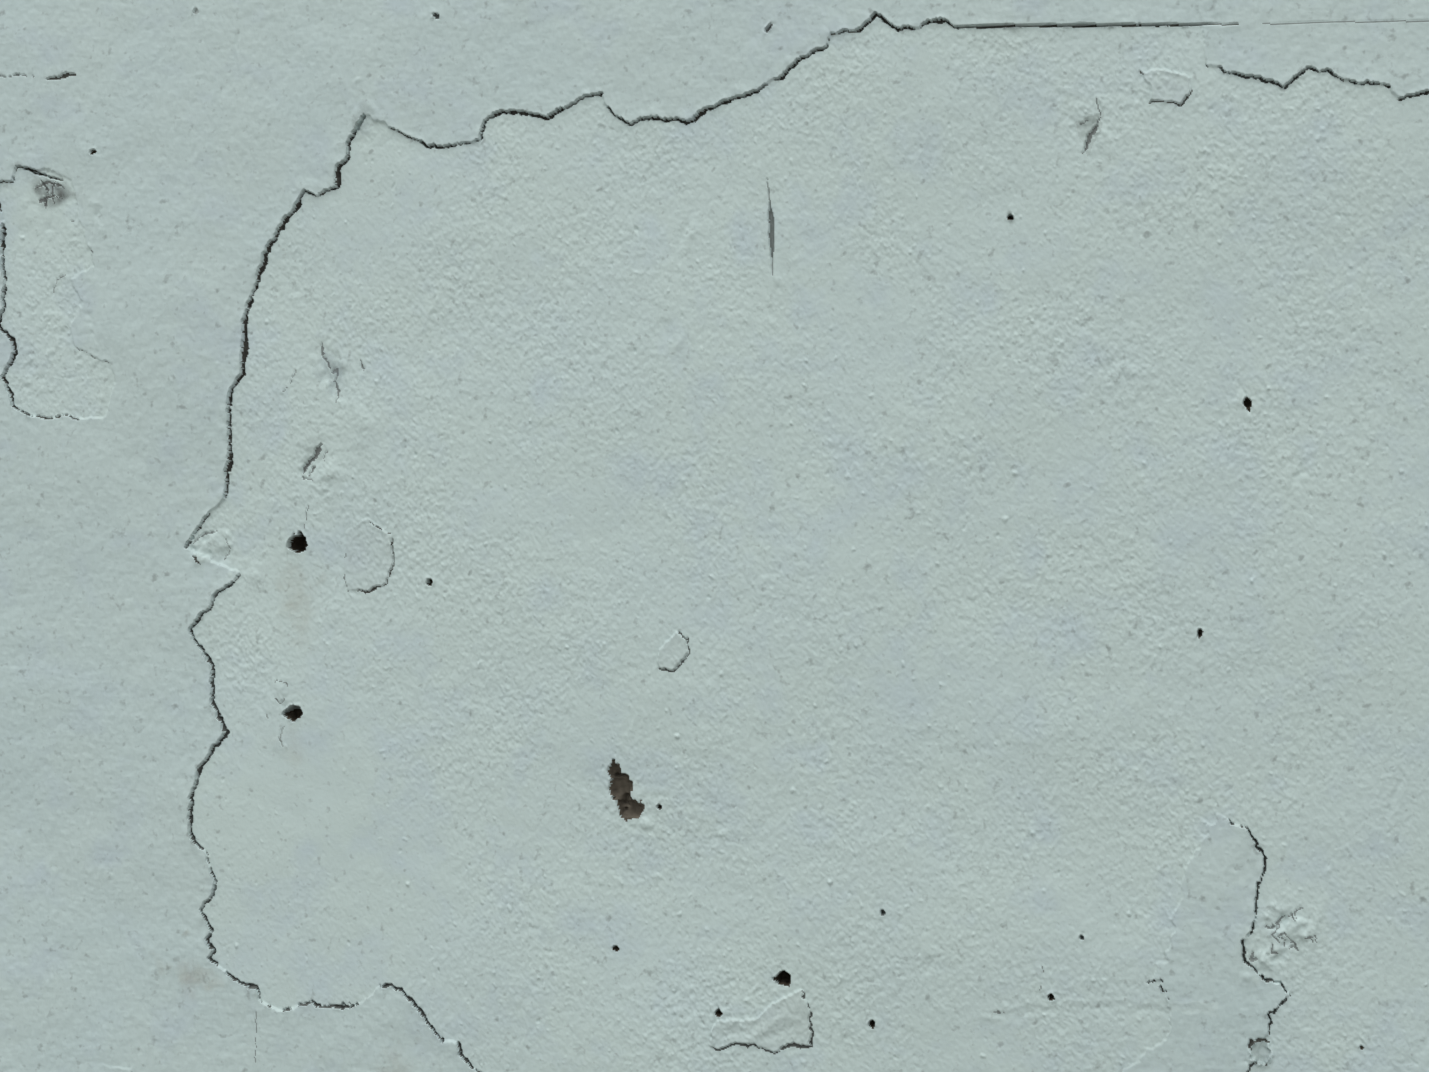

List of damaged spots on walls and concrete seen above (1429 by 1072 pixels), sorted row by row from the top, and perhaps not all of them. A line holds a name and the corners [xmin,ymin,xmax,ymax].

crack [972,20,1429,29]
peeling [672,109,708,125]
peeling [780,56,805,80]
spalling [1076,98,1104,156]
peeling [1140,69,1193,107]
crack [282,343,365,402]
spalling [299,444,329,481]
peeling [343,518,395,594]
crack [266,680,288,747]
spalling [607,759,645,822]
spalling [1236,890,1319,989]
peeling [709,990,814,1054]